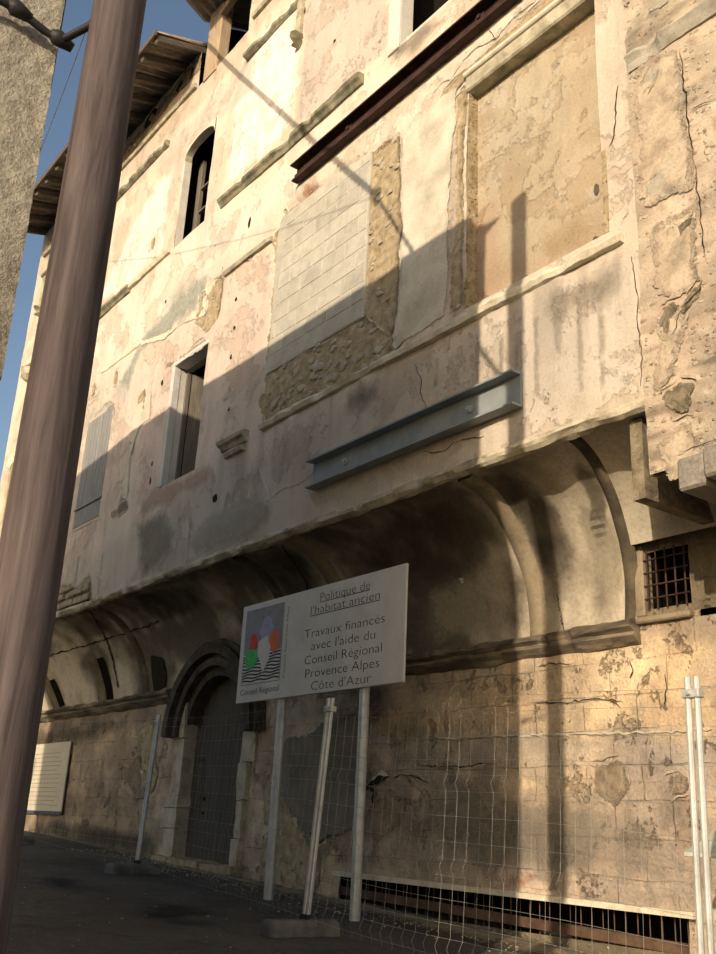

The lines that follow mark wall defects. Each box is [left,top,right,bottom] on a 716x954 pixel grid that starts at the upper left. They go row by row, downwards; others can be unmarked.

crack [609,86,618,147]
spalling [259,0,554,421]
crack [50,611,159,688]
crack [536,698,620,707]
crack [418,729,713,742]
peeling [260,711,407,891]
crack [366,762,498,804]